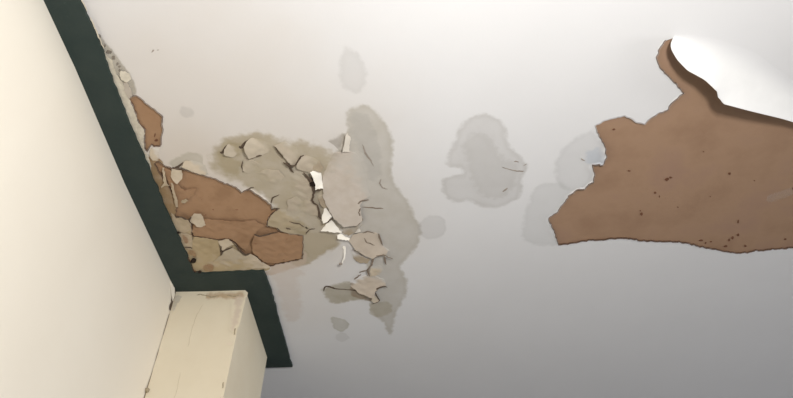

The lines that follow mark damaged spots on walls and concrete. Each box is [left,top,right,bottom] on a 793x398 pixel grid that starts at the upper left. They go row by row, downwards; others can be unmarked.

peeling [81,0,315,273]
crack [303,171,392,279]
peeling [342,225,359,236]
peeling [319,250,386,305]
crack [343,133,386,189]
damp [327,42,449,337]
damp [438,111,601,248]
peeling [547,35,793,255]